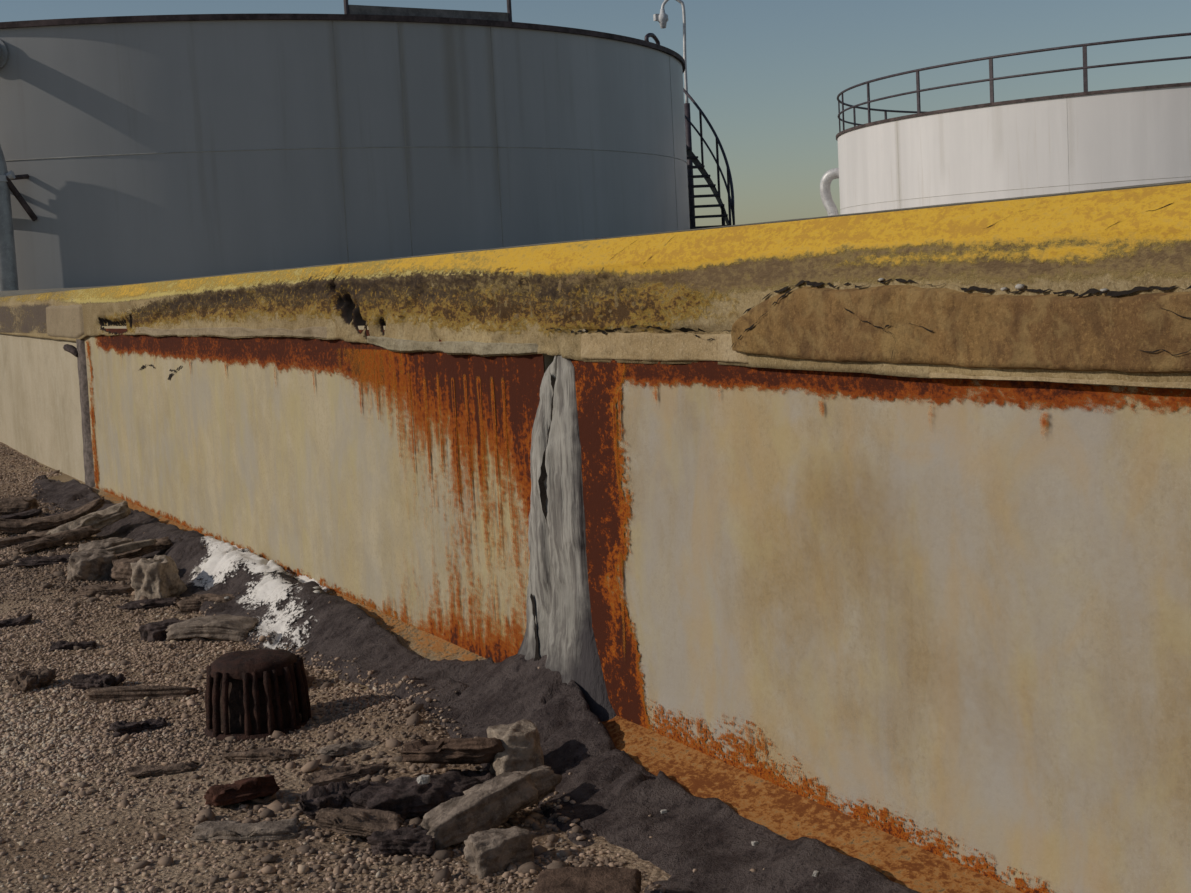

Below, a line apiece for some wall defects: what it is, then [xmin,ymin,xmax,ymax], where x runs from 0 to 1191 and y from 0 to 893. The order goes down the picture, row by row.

damp [120,267,645,319]
peeling [0,183,1191,355]
crack [546,278,1191,360]
flaking render [581,285,1191,389]
corrosion [86,329,544,663]
crack [538,373,556,524]
damp [189,536,329,650]
crack [530,594,540,661]
corrosion [570,359,1191,893]